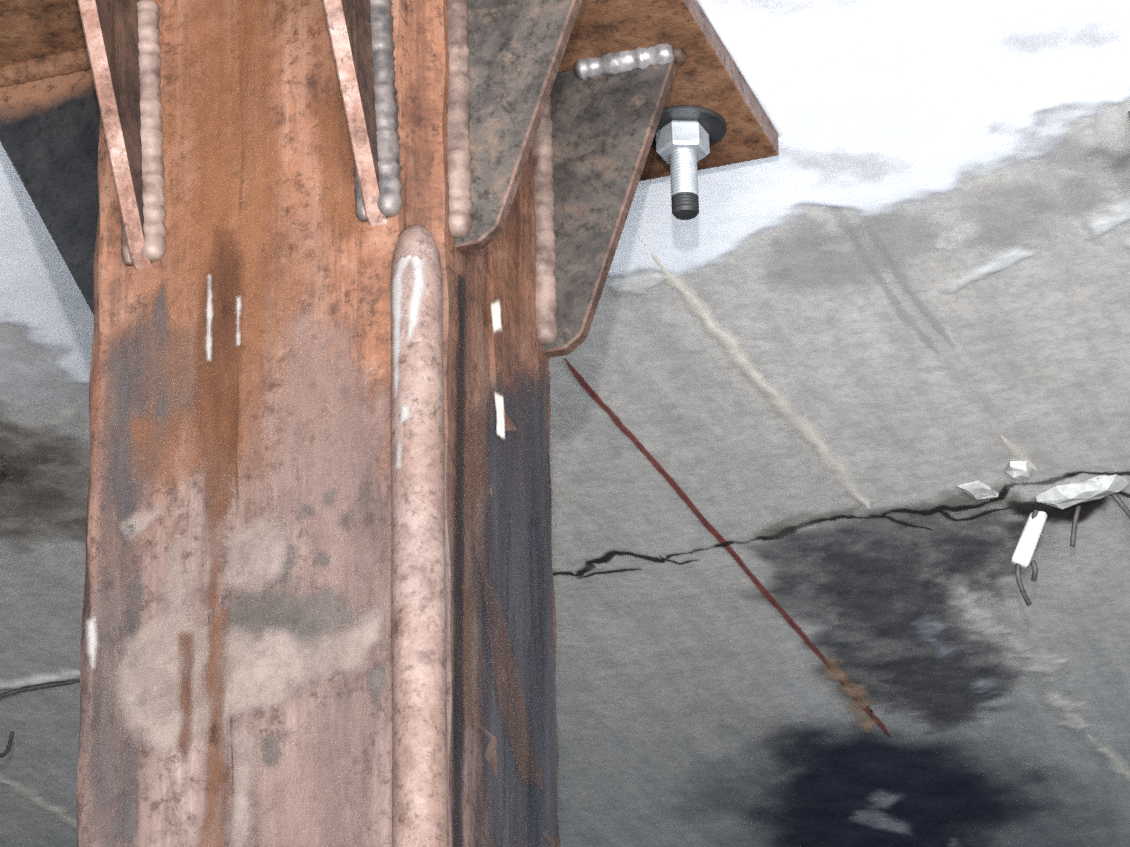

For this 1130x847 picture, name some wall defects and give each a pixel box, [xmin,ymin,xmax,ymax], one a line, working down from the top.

rust [200,235,240,515]
leakage [0,408,88,538]
crack [553,471,1130,579]
spalling [1005,461,1033,480]
spalling [957,471,1130,522]
leakage [756,491,1067,724]
rust [182,637,190,742]
rust [207,567,222,823]
leakage [1046,695,1090,737]